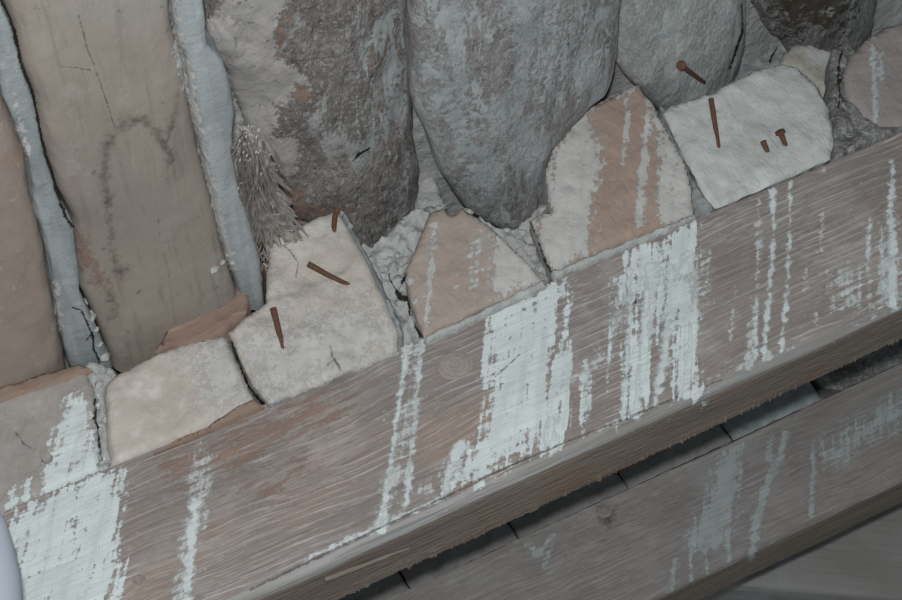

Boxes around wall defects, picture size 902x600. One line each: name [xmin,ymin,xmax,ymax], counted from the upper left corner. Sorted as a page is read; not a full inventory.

crack [72,307,100,364]
spalling [84,298,114,396]